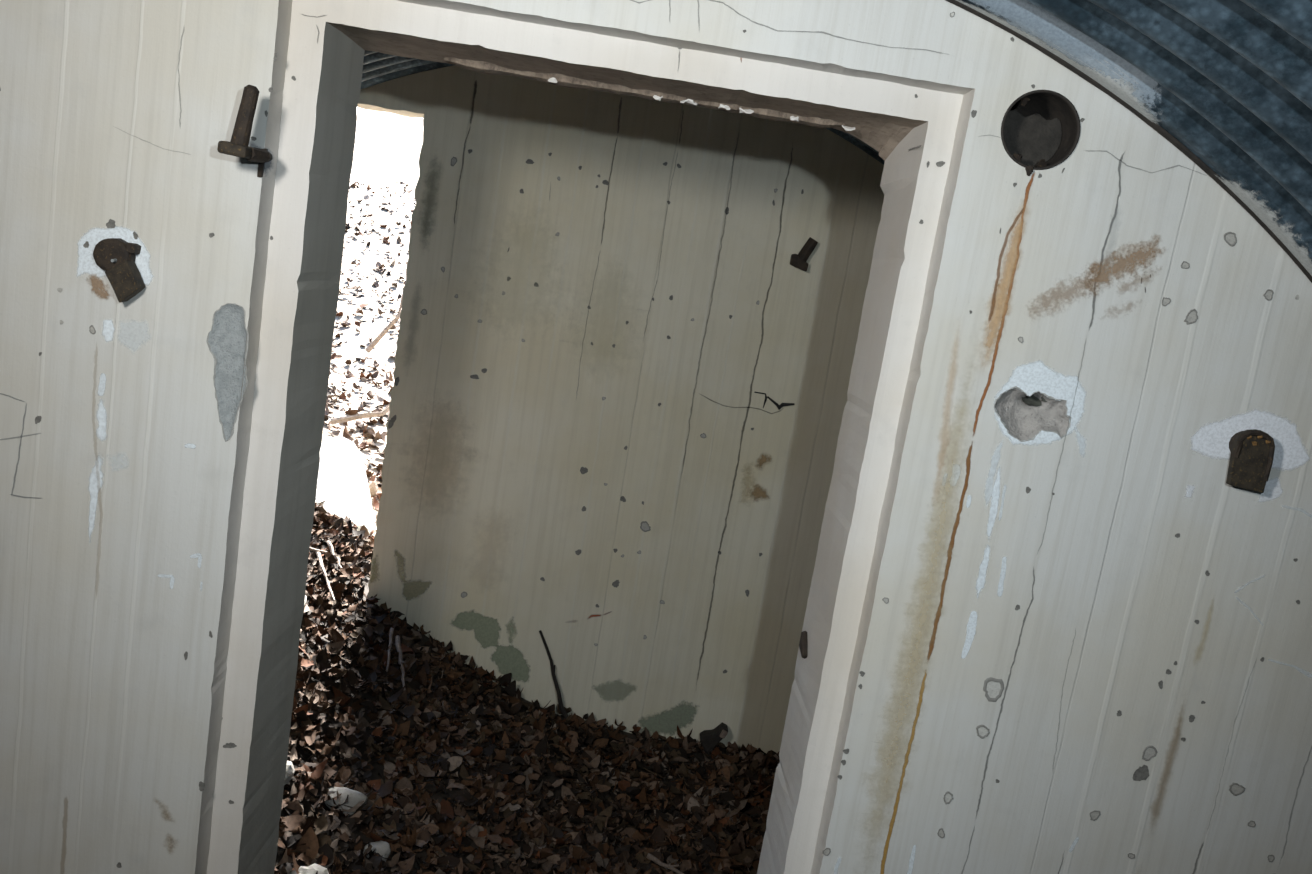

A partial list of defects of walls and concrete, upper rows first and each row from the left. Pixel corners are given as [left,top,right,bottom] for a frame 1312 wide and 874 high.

crack [1090,155,1123,327]
corrosion [1087,240,1161,287]
peeling [206,303,249,442]
crack [697,148,793,679]
corrosion [881,153,1047,874]
spalling [994,386,1071,442]
corrosion [1232,430,1275,481]
crack [977,570,1035,811]